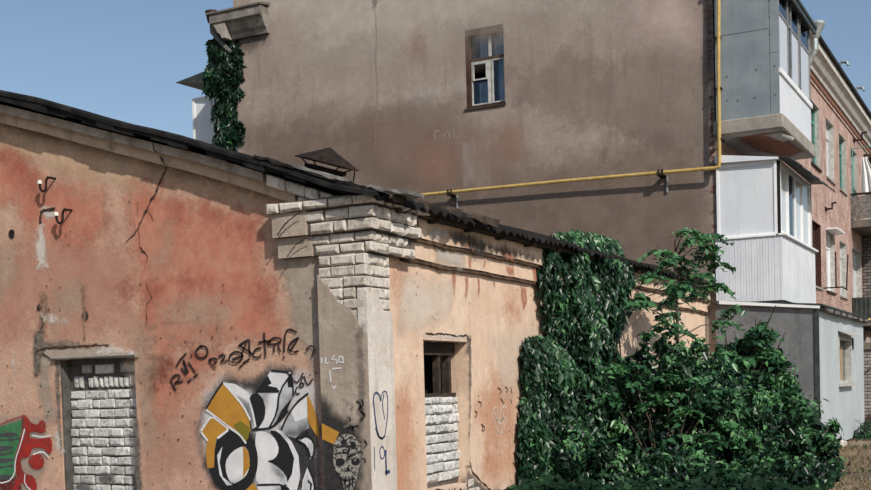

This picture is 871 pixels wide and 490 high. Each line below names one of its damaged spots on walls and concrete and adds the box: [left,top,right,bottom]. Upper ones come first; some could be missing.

crack [126,142,167,259]
peeling [0,128,472,490]